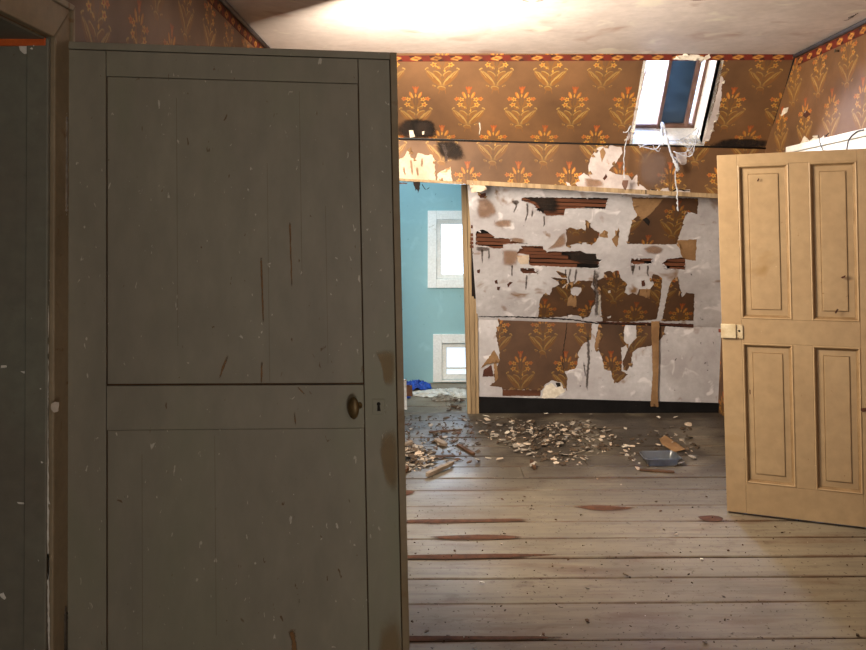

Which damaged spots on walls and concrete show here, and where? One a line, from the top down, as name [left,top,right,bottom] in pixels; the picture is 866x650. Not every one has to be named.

flaking render [470,183,487,198]
flaking render [521,196,608,216]
flaking render [470,225,615,290]
flaking render [631,257,686,295]
flaking render [502,383,565,399]